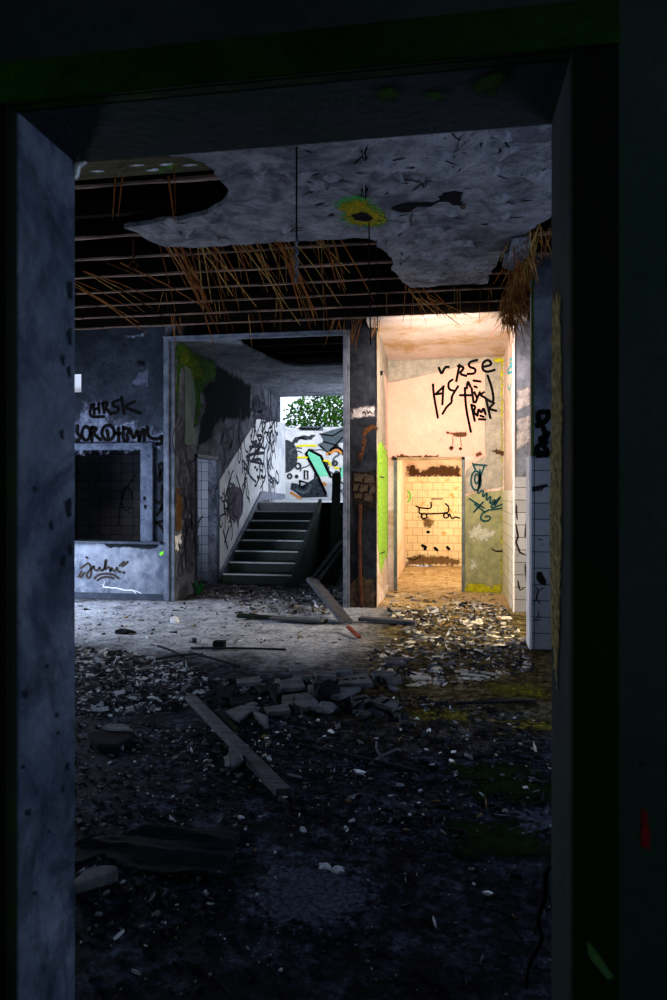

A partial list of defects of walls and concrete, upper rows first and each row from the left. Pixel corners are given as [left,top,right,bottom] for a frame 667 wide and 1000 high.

flaking render [74,161,88,180]
water stain [335,196,387,227]
flaking render [391,191,466,213]
flaking render [350,468,377,608]